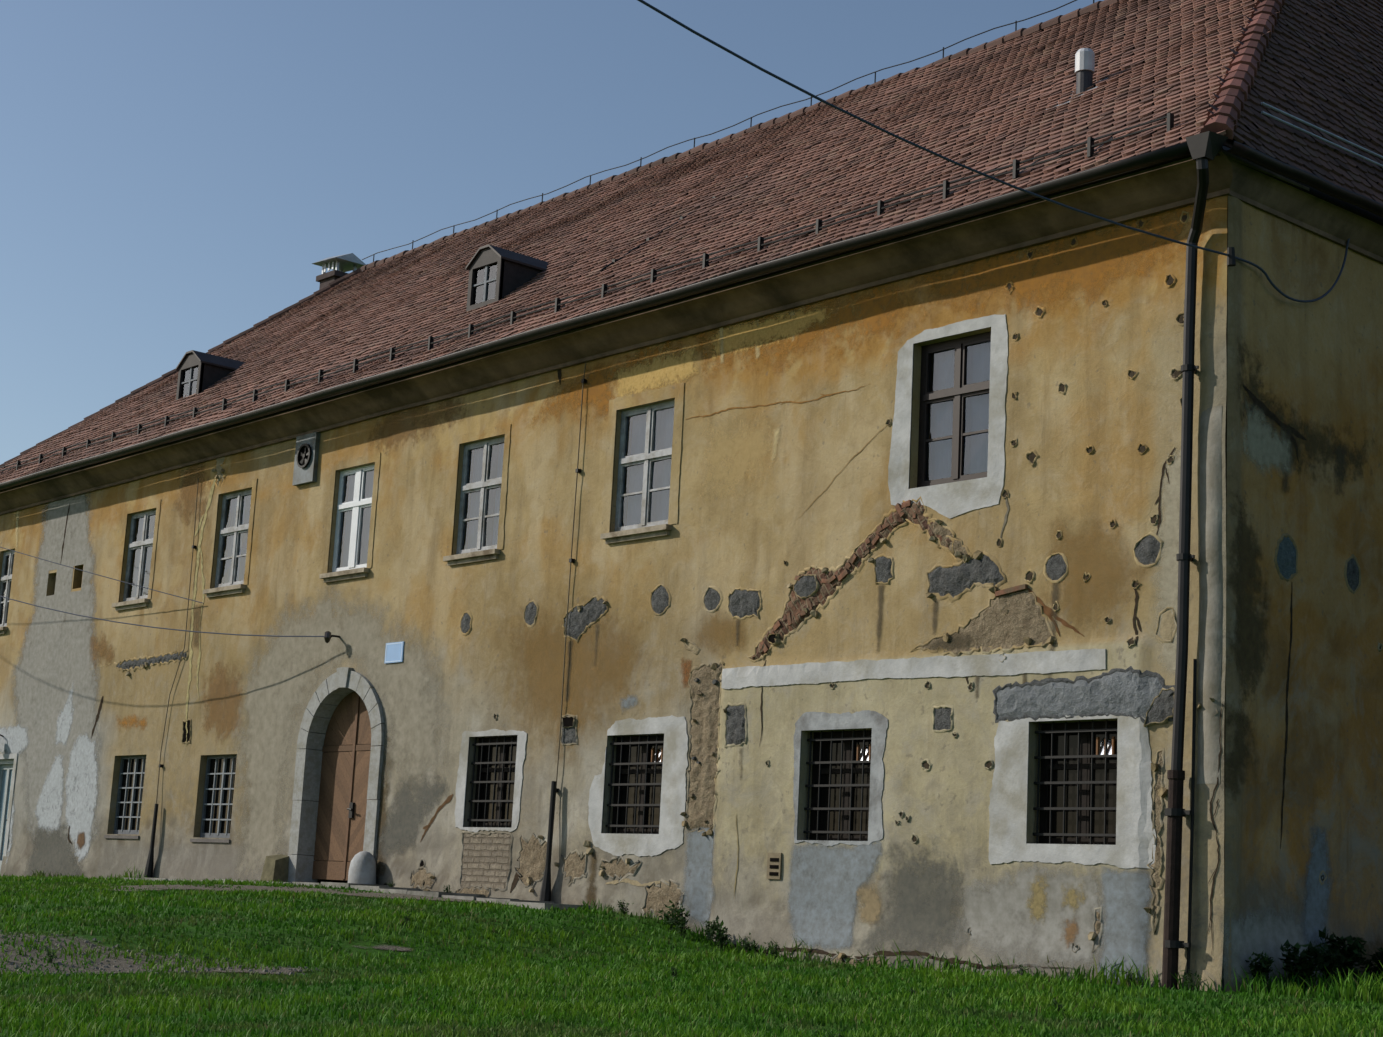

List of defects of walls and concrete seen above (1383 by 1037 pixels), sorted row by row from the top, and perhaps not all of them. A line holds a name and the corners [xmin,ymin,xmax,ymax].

crack [685,384,869,420]
crack [802,425,887,514]
water stain [1240,351,1362,490]
flaking render [703,496,1091,663]
flaking render [0,724,28,754]
flaking render [35,686,98,862]
water stain [376,736,446,881]
flaking render [680,638,727,836]
crack [1207,703,1223,953]
water stain [857,852,964,953]